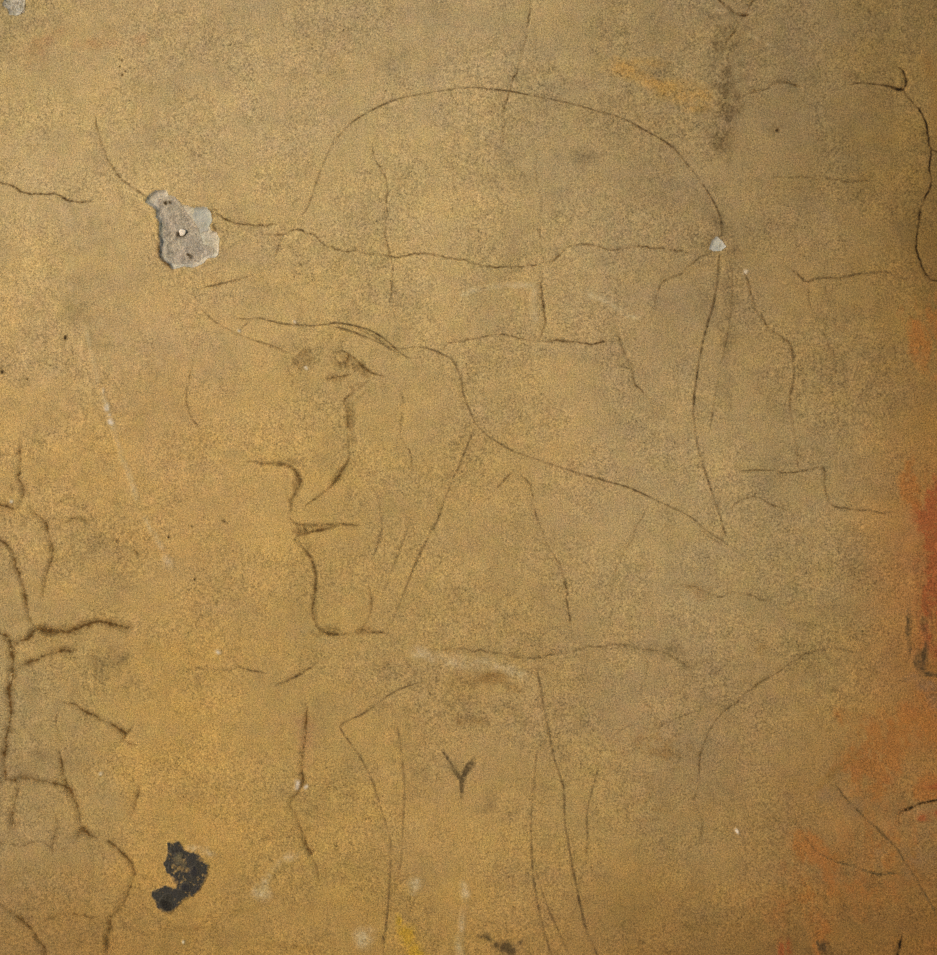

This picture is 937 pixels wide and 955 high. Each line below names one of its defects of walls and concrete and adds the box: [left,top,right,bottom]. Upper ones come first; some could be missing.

spalling [2,0,25,16]
crack [0,182,85,203]
spalling [145,190,220,269]
crack [494,255,604,345]
spalling [709,236,726,251]
crack [796,271,880,293]
crack [856,67,937,281]
crack [0,450,53,606]
crack [2,620,135,946]
crack [16,916,46,953]